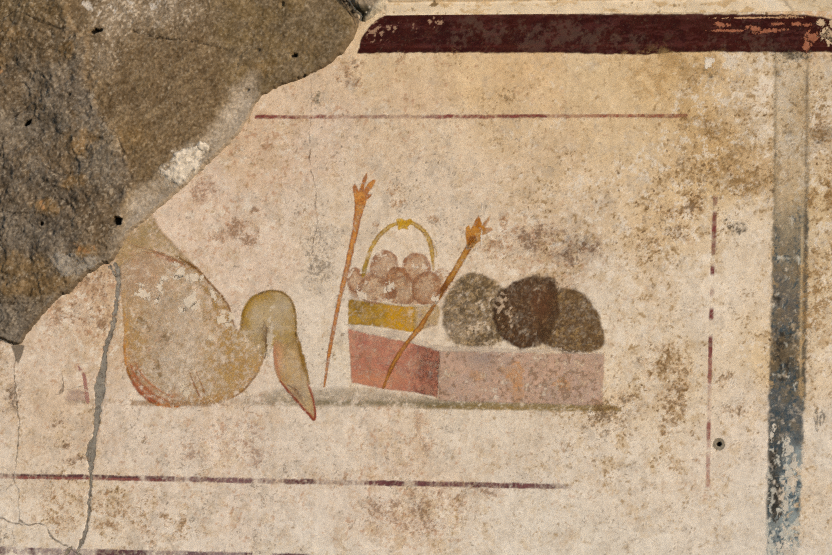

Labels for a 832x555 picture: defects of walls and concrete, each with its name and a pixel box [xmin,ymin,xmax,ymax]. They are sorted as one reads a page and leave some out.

flaking render [0,0,358,345]
peeling [713,15,832,53]
crack [3,262,121,555]